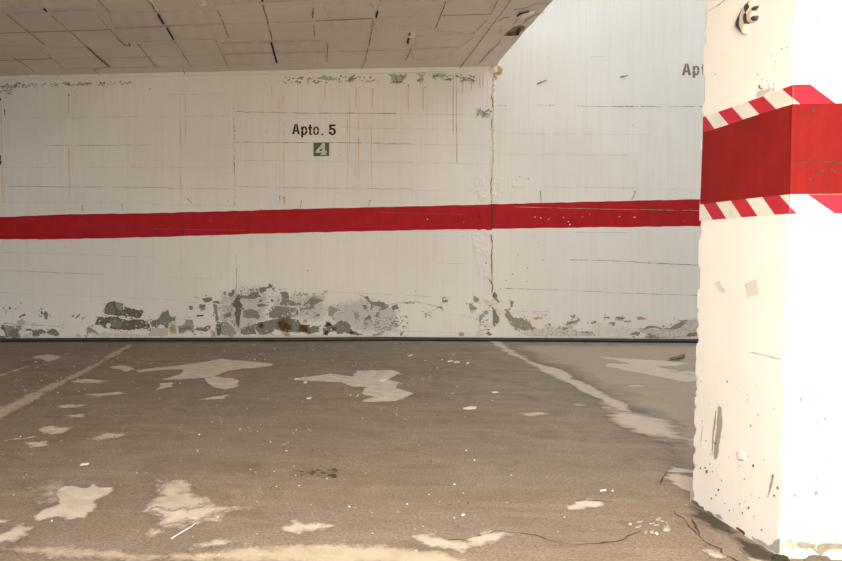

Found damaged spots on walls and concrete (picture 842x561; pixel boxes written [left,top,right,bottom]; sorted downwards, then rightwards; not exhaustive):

crack [261,0,381,69]
crack [405,0,546,293]
peeling [0,302,60,338]
spalling [72,280,449,338]
spalling [466,288,699,339]
crack [448,530,639,545]
crack [674,511,738,561]